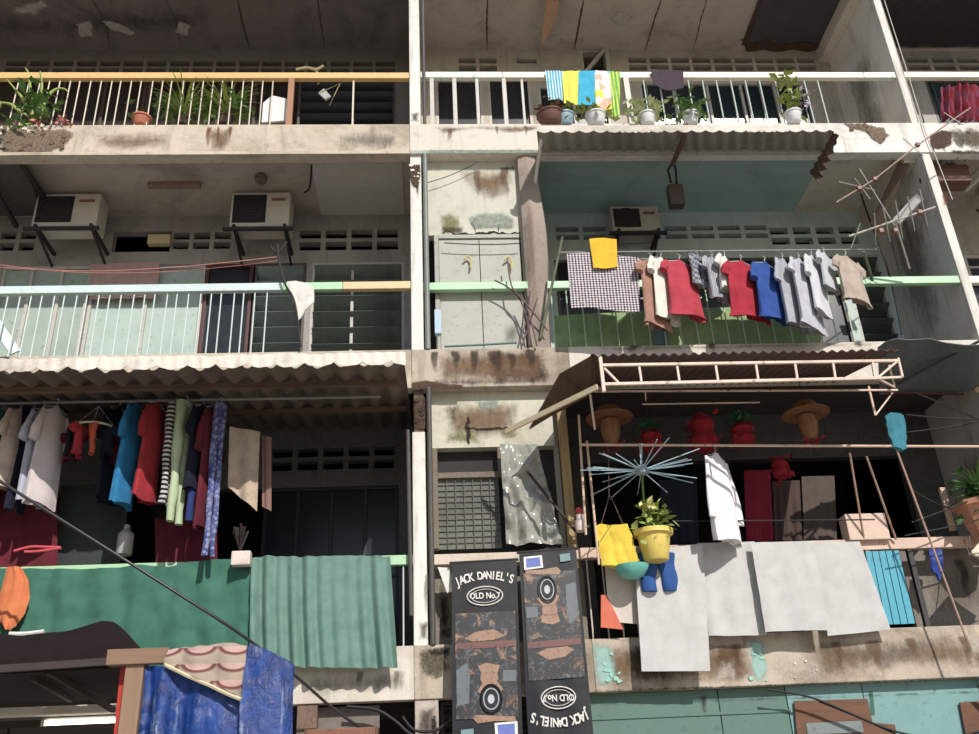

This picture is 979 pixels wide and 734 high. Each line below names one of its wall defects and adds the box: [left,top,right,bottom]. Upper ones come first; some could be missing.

crack [645,0,662,50]
spalling [0,123,73,152]
rust [206,127,232,148]
spalling [845,123,888,144]
damp [949,128,979,154]
damp [474,168,513,195]
damp [431,350,544,383]
damp [451,401,513,440]
crack [465,417,508,444]
damp [825,642,882,666]
damp [897,637,979,660]